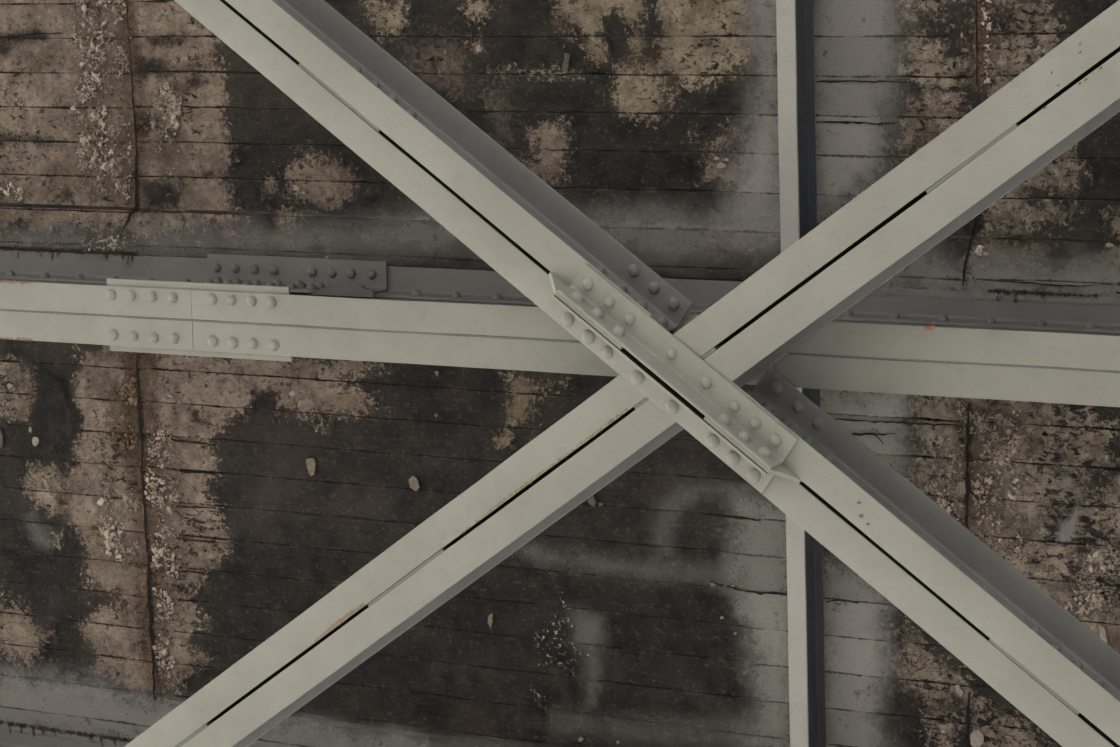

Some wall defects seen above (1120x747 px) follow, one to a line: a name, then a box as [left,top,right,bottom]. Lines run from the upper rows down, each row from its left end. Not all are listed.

crack [972,0,980,86]
leakage [981,0,1001,87]
leakage [62,0,204,213]
crack [119,0,152,237]
rust [988,288,1098,302]
leakage [27,372,80,465]
leakage [96,376,187,695]
crack [126,354,206,708]
crack [171,438,218,476]
crack [176,503,215,511]
leakage [925,397,1041,556]
leakage [1064,544,1120,619]